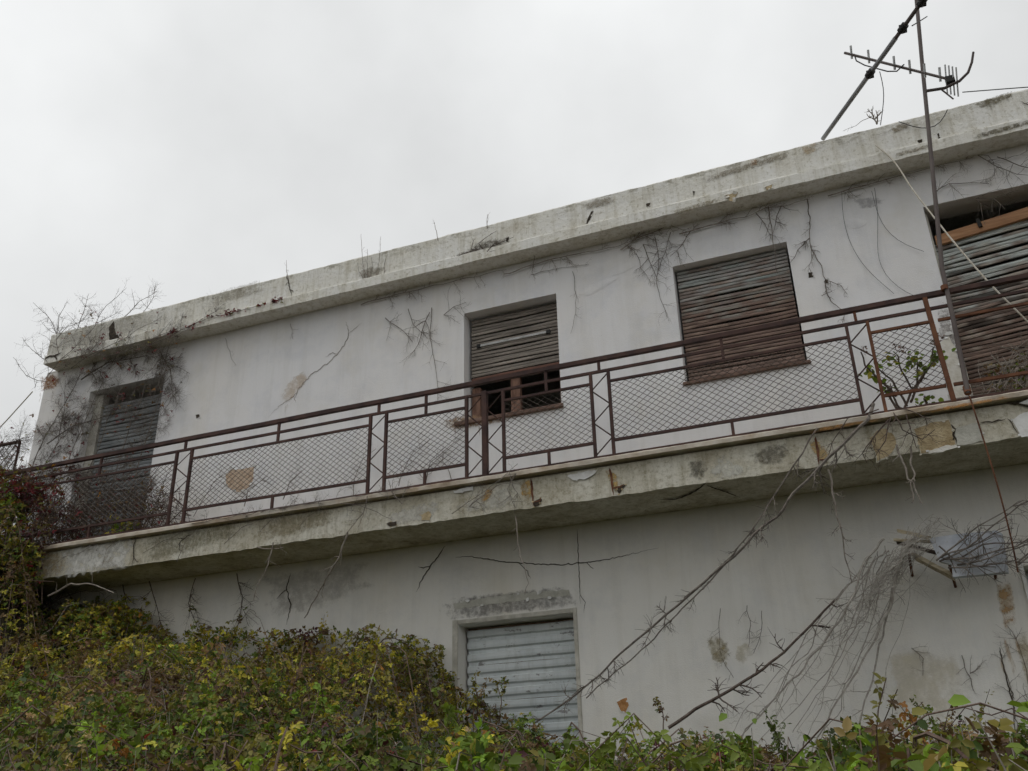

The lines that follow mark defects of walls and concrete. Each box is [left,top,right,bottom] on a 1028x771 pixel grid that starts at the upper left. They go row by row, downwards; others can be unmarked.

crack [273,323,354,412]
spalling [868,427,899,463]
spalling [913,419,960,455]
peeling [1011,412,1028,438]
spalling [616,696,630,714]